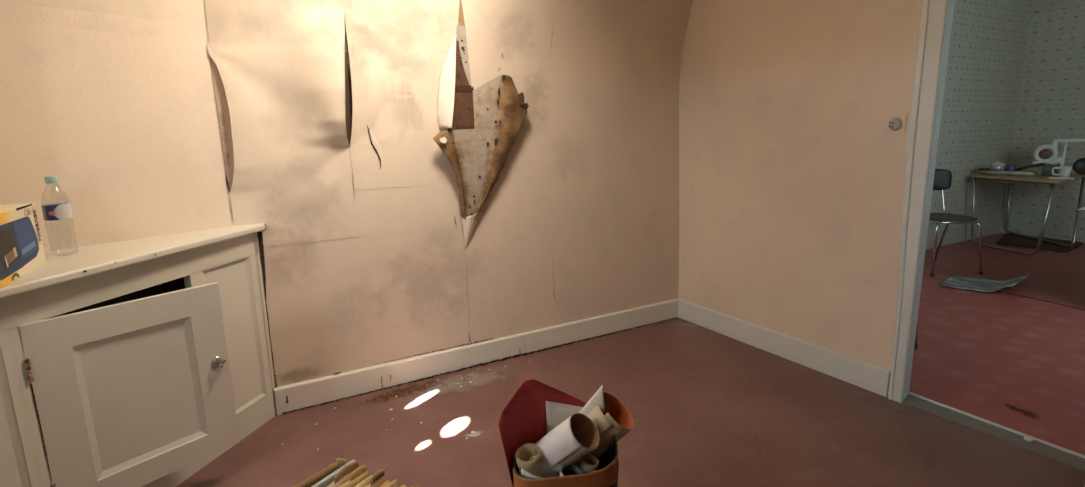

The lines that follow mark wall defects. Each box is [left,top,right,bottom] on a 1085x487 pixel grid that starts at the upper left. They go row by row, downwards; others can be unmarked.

flaking render [456,24,472,86]
crack [210,60,678,414]